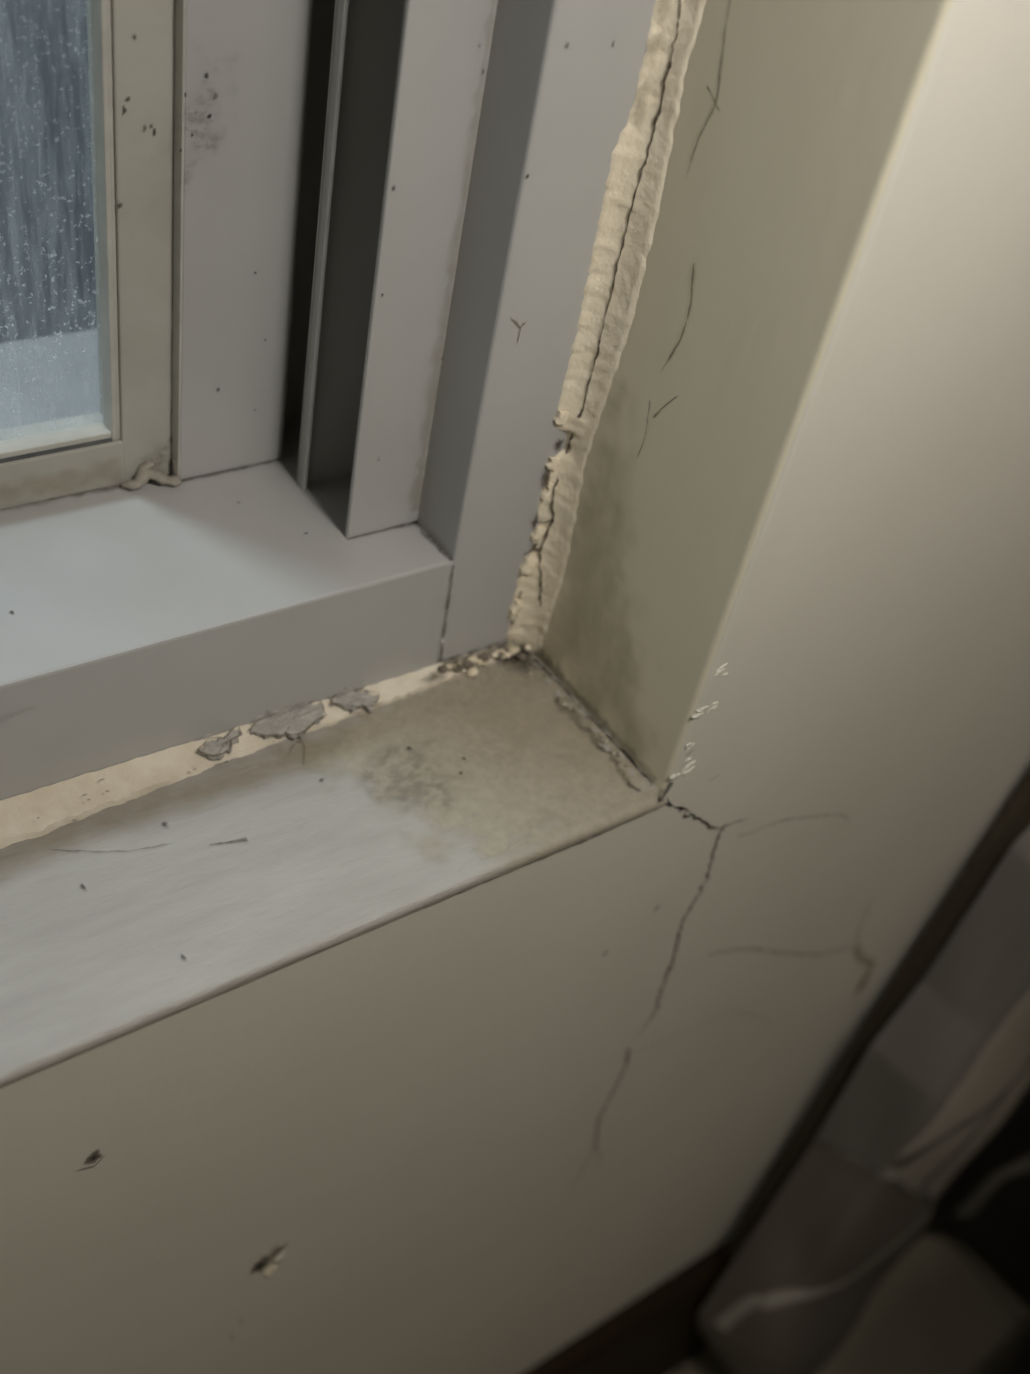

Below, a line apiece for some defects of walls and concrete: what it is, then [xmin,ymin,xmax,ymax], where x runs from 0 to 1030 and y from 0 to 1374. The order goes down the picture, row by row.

crack [690,0,730,163]
crack [524,0,681,607]
crack [665,263,694,365]
spalling [508,410,569,625]
peeling [194,684,379,760]
leakage [307,655,665,856]
crack [498,651,745,1180]